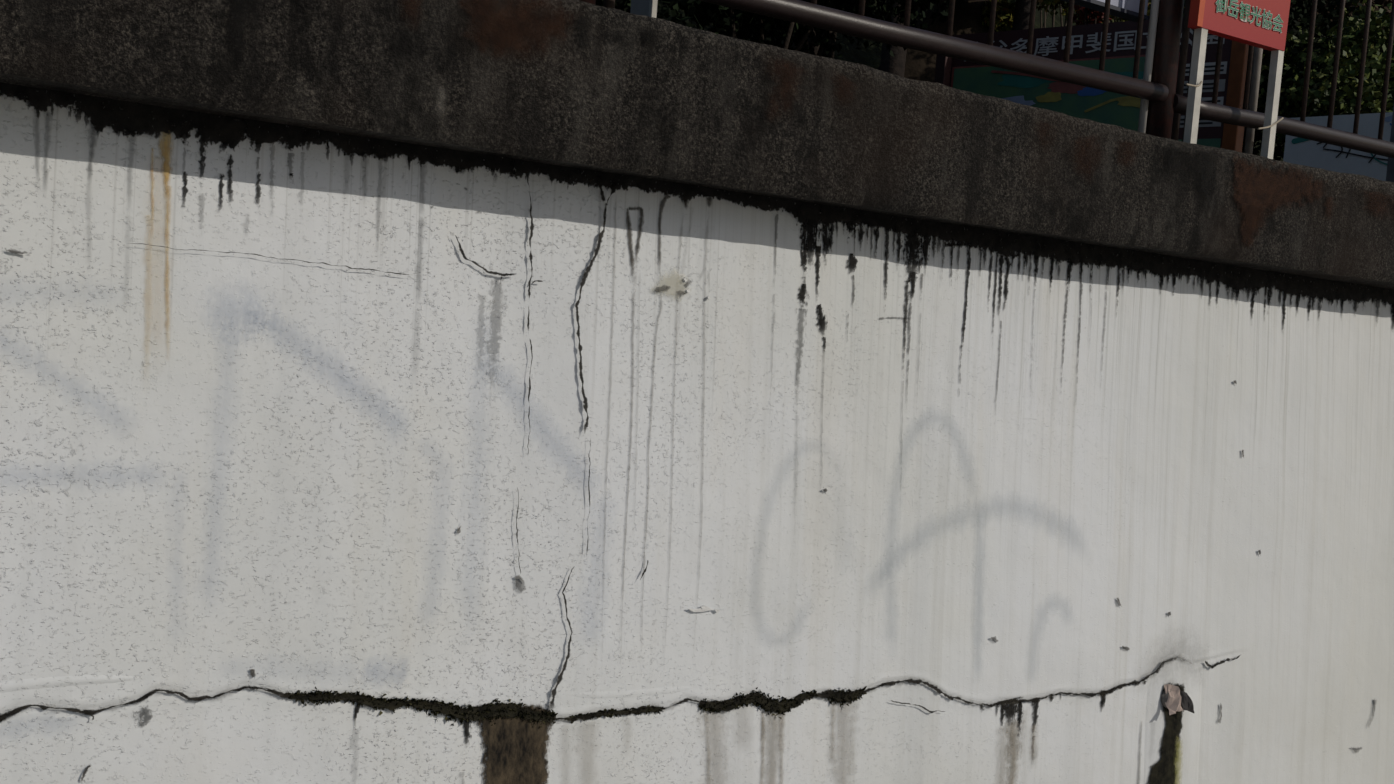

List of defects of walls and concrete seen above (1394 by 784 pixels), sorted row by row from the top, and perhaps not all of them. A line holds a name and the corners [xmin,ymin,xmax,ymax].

corrosion [160,133,171,186]
water stain [0,82,1394,376]
crack [0,175,1240,722]
water stain [460,705,554,784]
water stain [1148,683,1185,784]